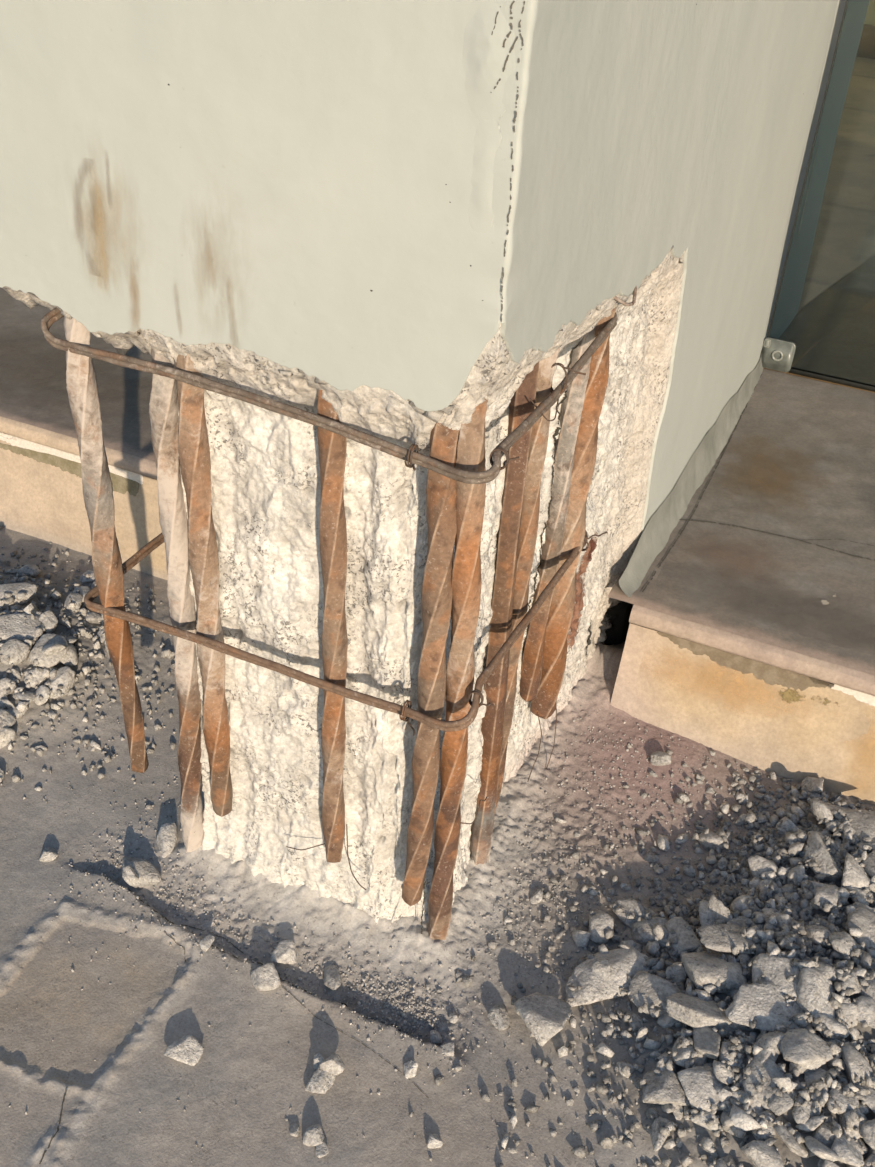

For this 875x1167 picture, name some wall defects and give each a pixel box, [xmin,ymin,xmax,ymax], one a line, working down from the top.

crack [491,0,525,322]
spalling [3,286,73,320]
peeling [0,432,82,478]
spalling [91,246,687,925]
corrosion [567,533,597,649]
crack [586,374,873,657]
crack [128,881,428,1098]